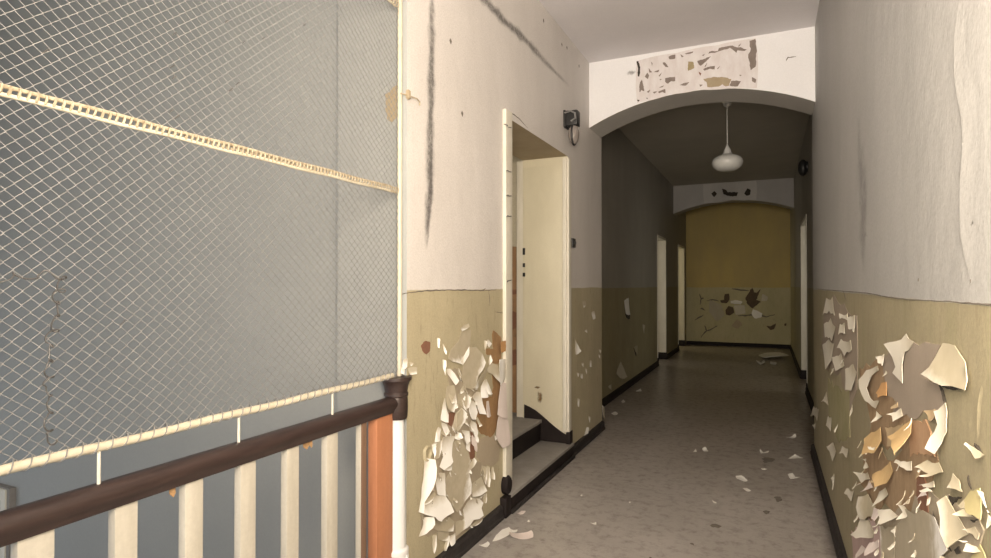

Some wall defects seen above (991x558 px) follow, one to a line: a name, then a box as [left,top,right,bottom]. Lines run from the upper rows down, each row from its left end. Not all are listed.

water stain [482,0,537,53]
peeling [636,38,758,103]
peeling [709,288,786,330]
peeling [575,340,601,379]
peeling [419,324,517,554]
peeling [810,295,991,558]